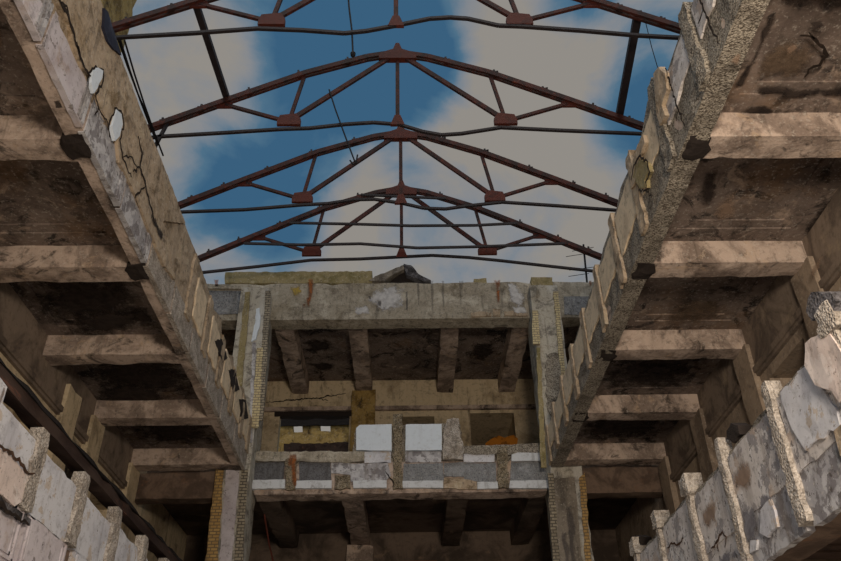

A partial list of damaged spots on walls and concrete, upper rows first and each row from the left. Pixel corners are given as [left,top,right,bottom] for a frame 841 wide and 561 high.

crack [800,32,829,78]
peeling [87,68,103,93]
crack [59,0,156,224]
peeling [109,109,123,141]
spalling [682,135,711,161]
crack [0,444,35,475]
peeling [0,449,31,526]
crack [0,501,29,525]